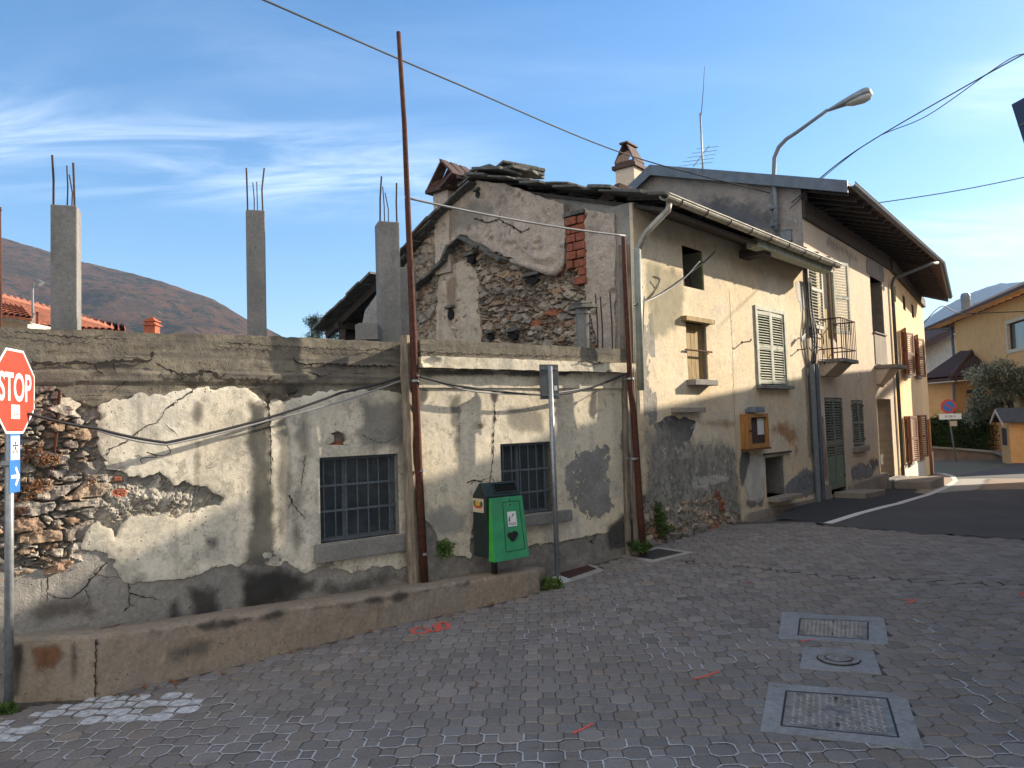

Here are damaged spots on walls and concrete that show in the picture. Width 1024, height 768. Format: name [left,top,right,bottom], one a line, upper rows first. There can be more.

crack [474,212,530,233]
spalling [405,209,587,347]
crack [46,562,159,611]
spalling [0,386,222,581]
damp [192,403,313,629]
crack [15,331,605,517]
spalling [326,432,350,445]
damp [366,592,407,602]
flaking render [417,522,633,583]
flaking render [565,444,614,520]
flaking render [632,415,765,546]
damp [852,454,883,481]